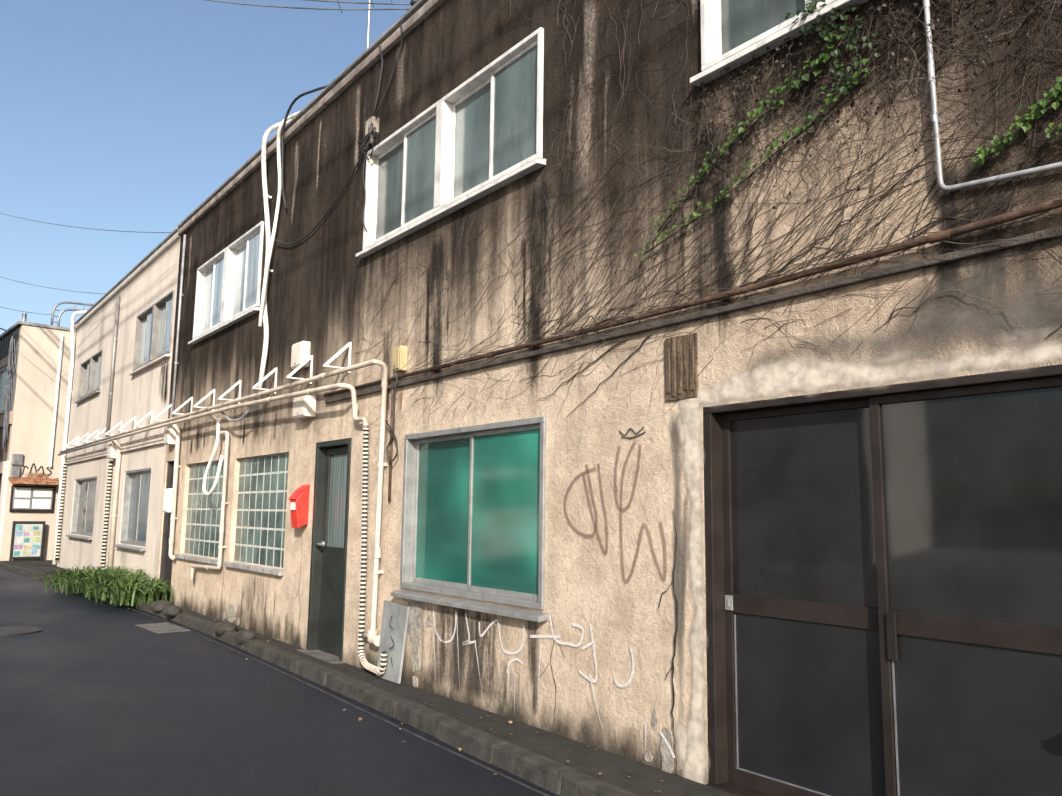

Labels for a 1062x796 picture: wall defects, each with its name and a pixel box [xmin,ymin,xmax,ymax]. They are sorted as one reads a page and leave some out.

damp [578,6,595,174]
damp [425,239,449,387]
damp [521,183,554,380]
damp [682,128,738,318]
crack [658,510,678,775]